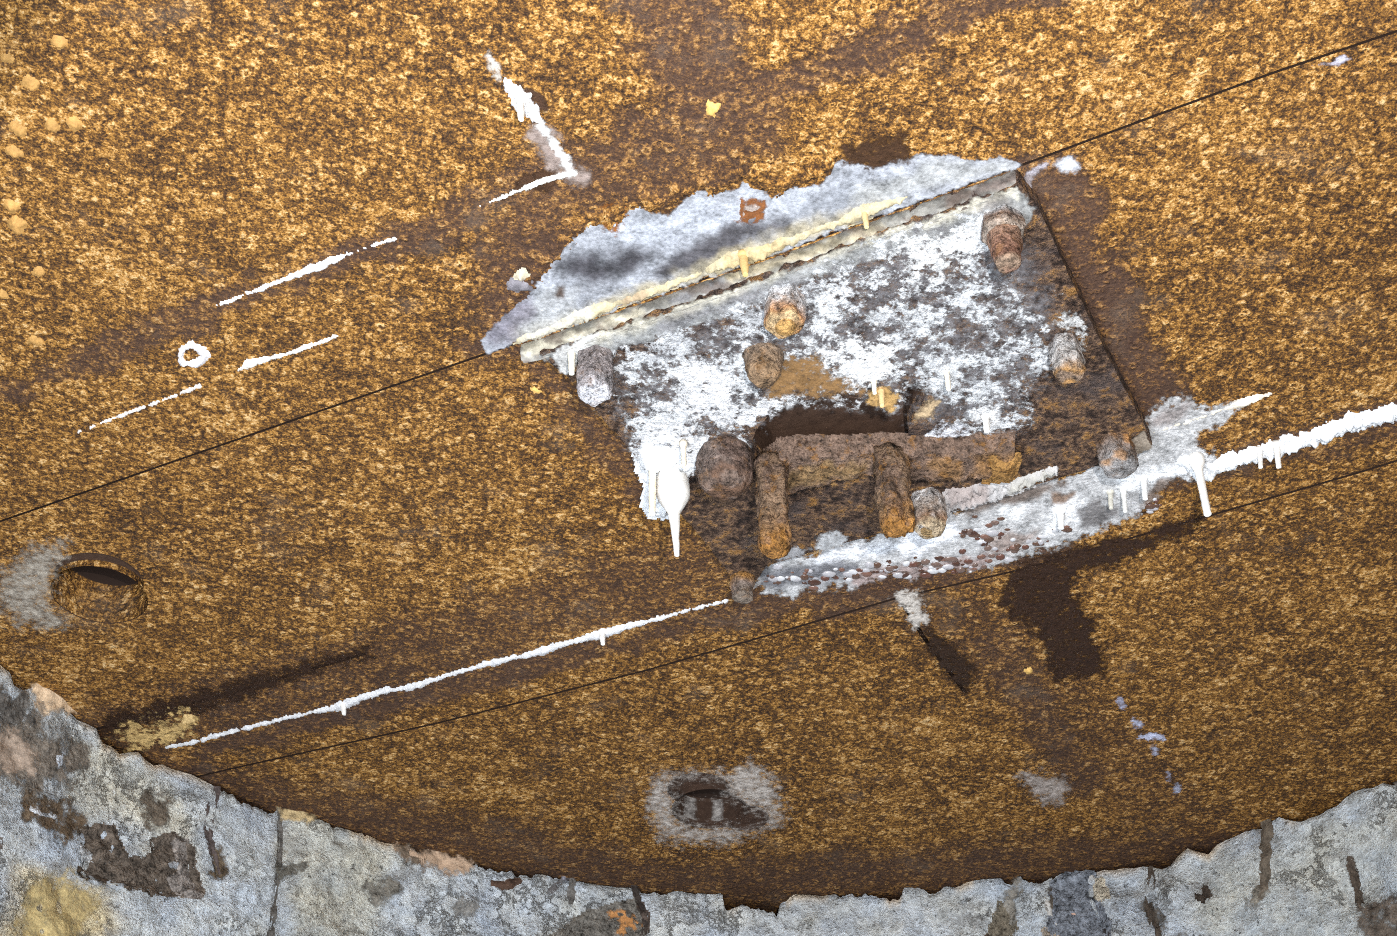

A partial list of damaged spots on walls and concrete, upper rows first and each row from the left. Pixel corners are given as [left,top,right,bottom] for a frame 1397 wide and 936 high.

damp [479,53,591,207]
damp [216,237,397,306]
peeling [481,149,1020,354]
corrosion [765,355,900,413]
corrosion [763,400,1022,495]
peeling [1131,431,1152,454]
damp [755,392,1397,694]
damp [101,645,376,736]
damp [165,599,728,749]
damp [684,796,696,820]
damp [712,799,722,821]